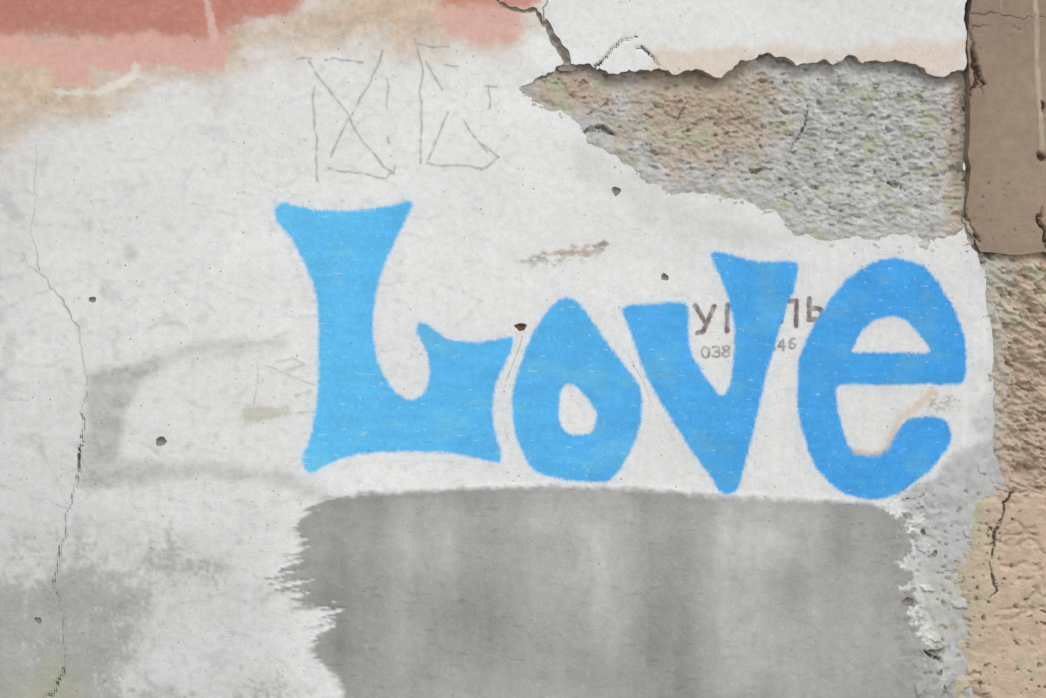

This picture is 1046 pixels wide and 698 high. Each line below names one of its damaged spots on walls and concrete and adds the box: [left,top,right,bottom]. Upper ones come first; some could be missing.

crack [496,0,661,71]
crack [1035,212,1046,249]
spalling [519,54,1046,494]
crack [21,144,113,698]
peeling [907,511,940,557]
crack [985,490,1017,599]
spalling [902,584,935,606]